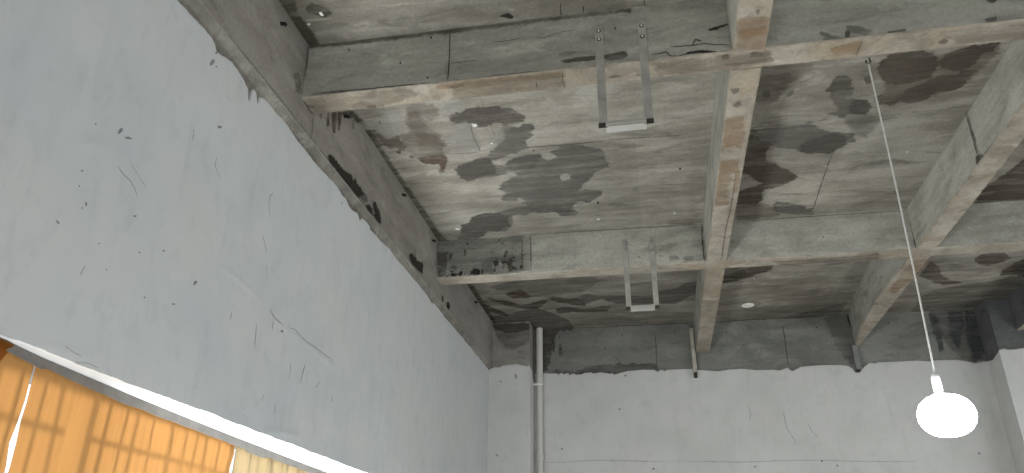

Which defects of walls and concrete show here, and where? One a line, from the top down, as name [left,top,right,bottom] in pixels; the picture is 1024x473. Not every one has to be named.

leakage [311,81,696,375]